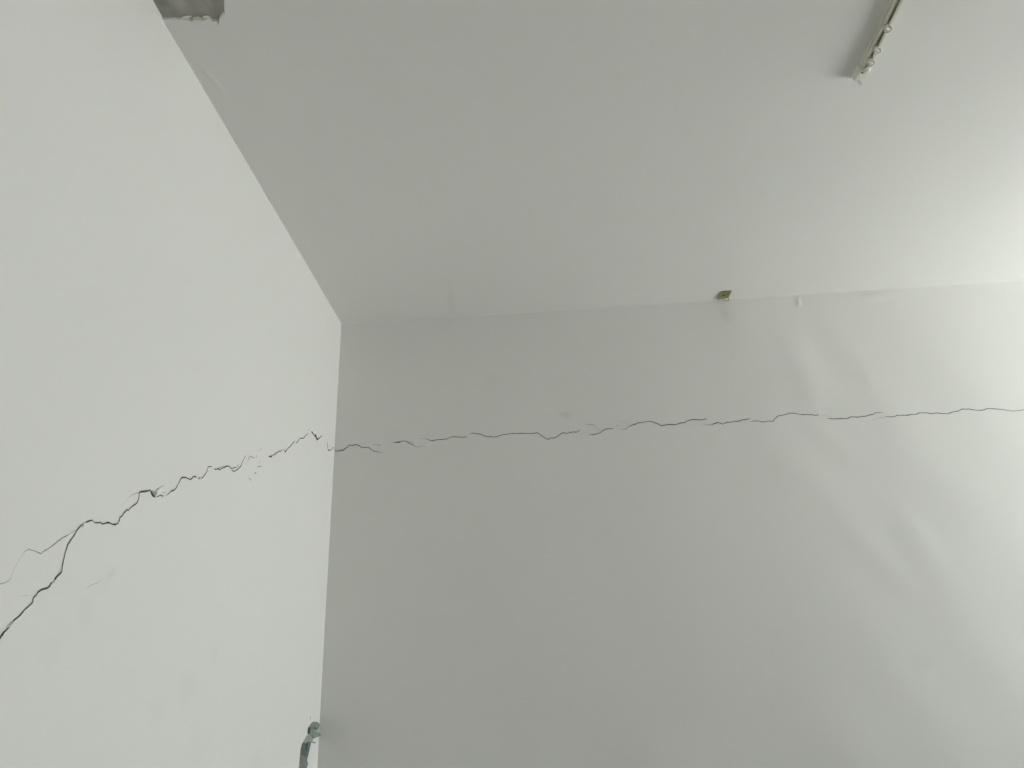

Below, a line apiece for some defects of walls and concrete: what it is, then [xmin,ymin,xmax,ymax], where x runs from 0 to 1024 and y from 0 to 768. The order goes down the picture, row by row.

crack [0,408,1024,639]